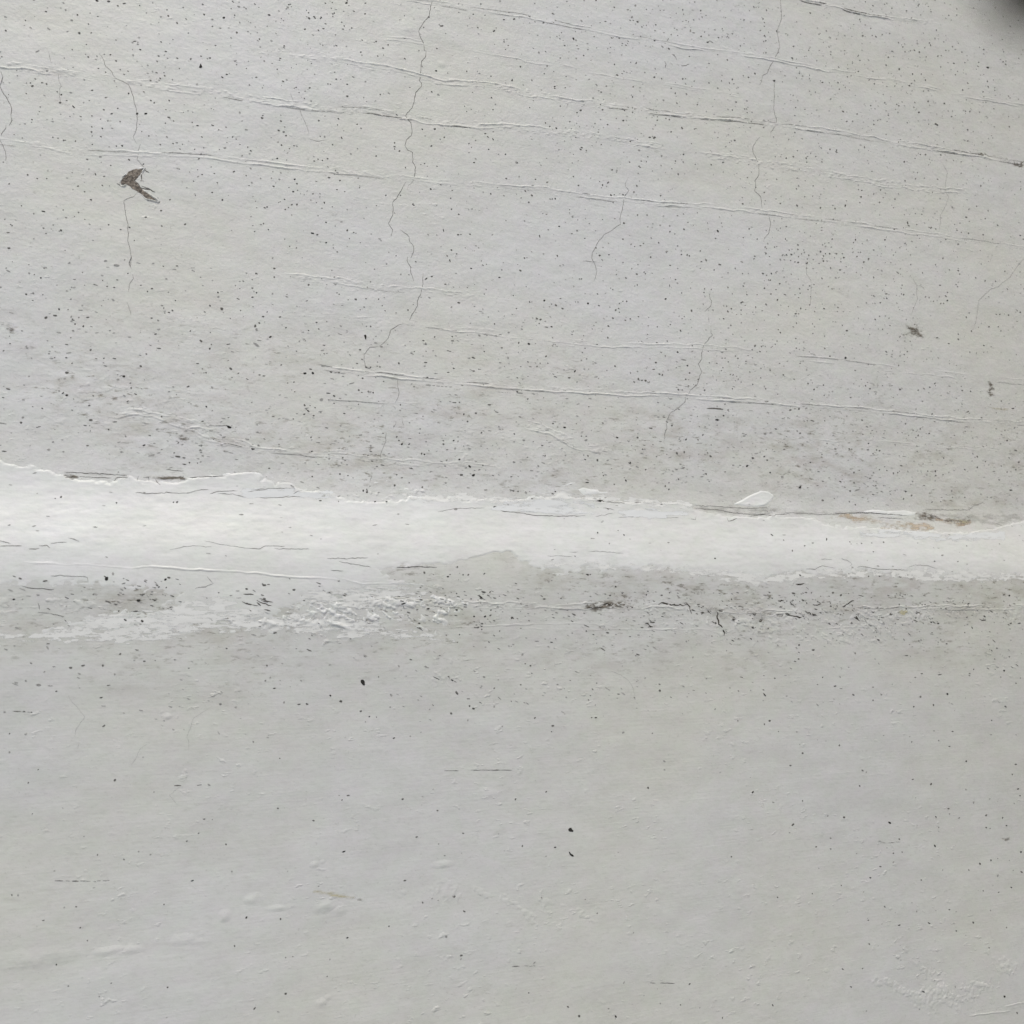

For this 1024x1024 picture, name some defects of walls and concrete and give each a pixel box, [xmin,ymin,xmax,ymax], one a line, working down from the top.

peeling [118,167,160,203]
leakage [0,582,455,647]